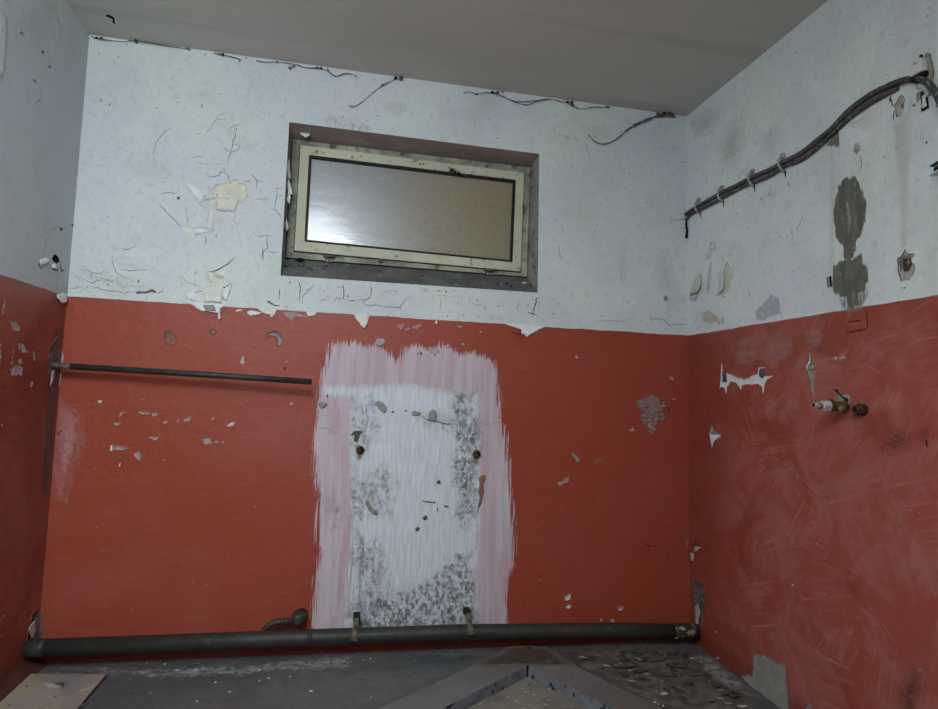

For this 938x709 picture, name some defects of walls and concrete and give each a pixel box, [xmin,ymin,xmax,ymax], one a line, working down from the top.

crack [194,113,284,219]
leakage [828,96,893,268]
crack [67,247,165,294]
flaking render [897,248,918,283]
crack [279,281,406,308]
peeling [354,314,370,328]
peeling [504,323,542,337]
spalling [0,340,35,387]
peeling [718,362,774,398]
flaking render [41,327,69,496]
peeling [629,393,676,436]
peeling [478,475,486,508]